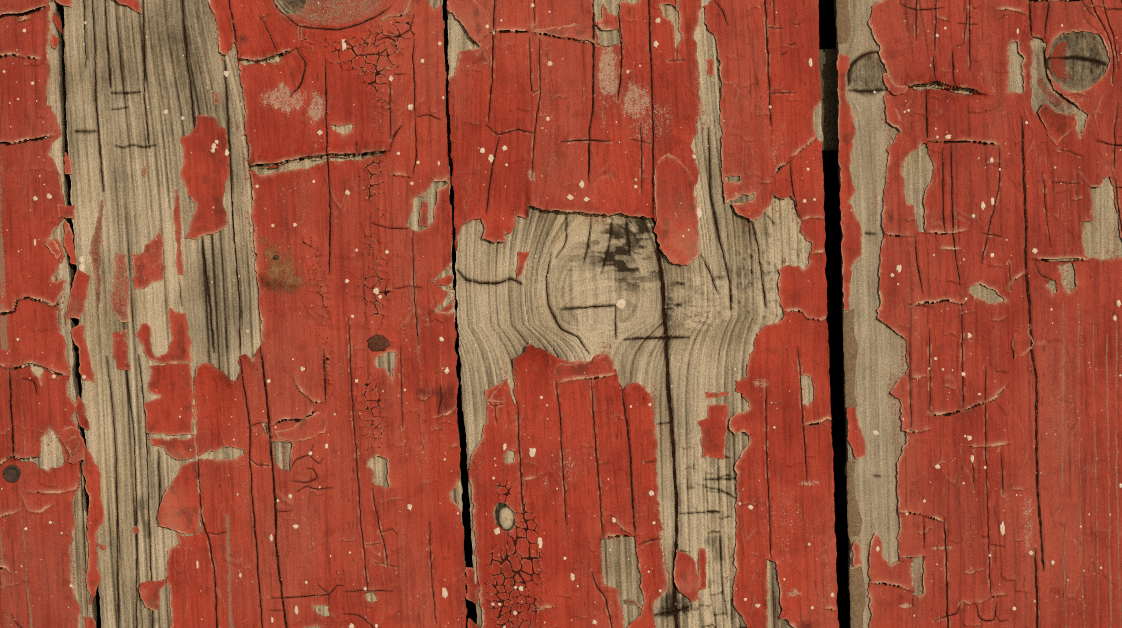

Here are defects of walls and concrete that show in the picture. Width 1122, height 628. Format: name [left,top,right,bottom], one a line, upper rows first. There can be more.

peeling [7,0,389,628]
crack [179,0,457,628]
peeling [375,352,396,376]
crack [457,0,736,628]
peeling [428,0,818,628]
peeling [810,103,824,143]
crack [848,52,882,92]
peeling [835,0,980,628]
crack [866,0,1083,628]
crack [1005,0,1122,230]
peeling [1048,176,1122,295]